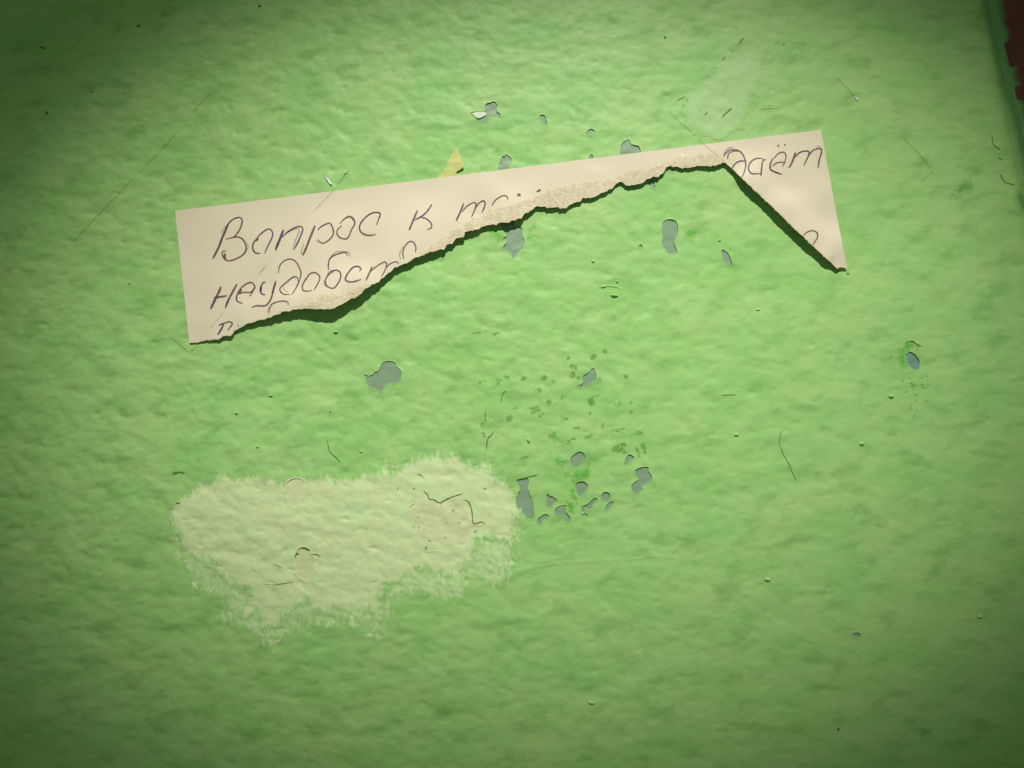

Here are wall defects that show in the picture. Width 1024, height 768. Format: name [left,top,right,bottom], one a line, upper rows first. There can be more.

peeling [469,100,502,124]
peeling [619,138,642,155]
peeling [500,220,526,260]
peeling [660,218,679,255]
peeling [362,360,403,394]
peeling [578,366,598,389]
peeling [905,350,921,371]
peeling [623,453,653,496]
peeling [164,447,615,655]